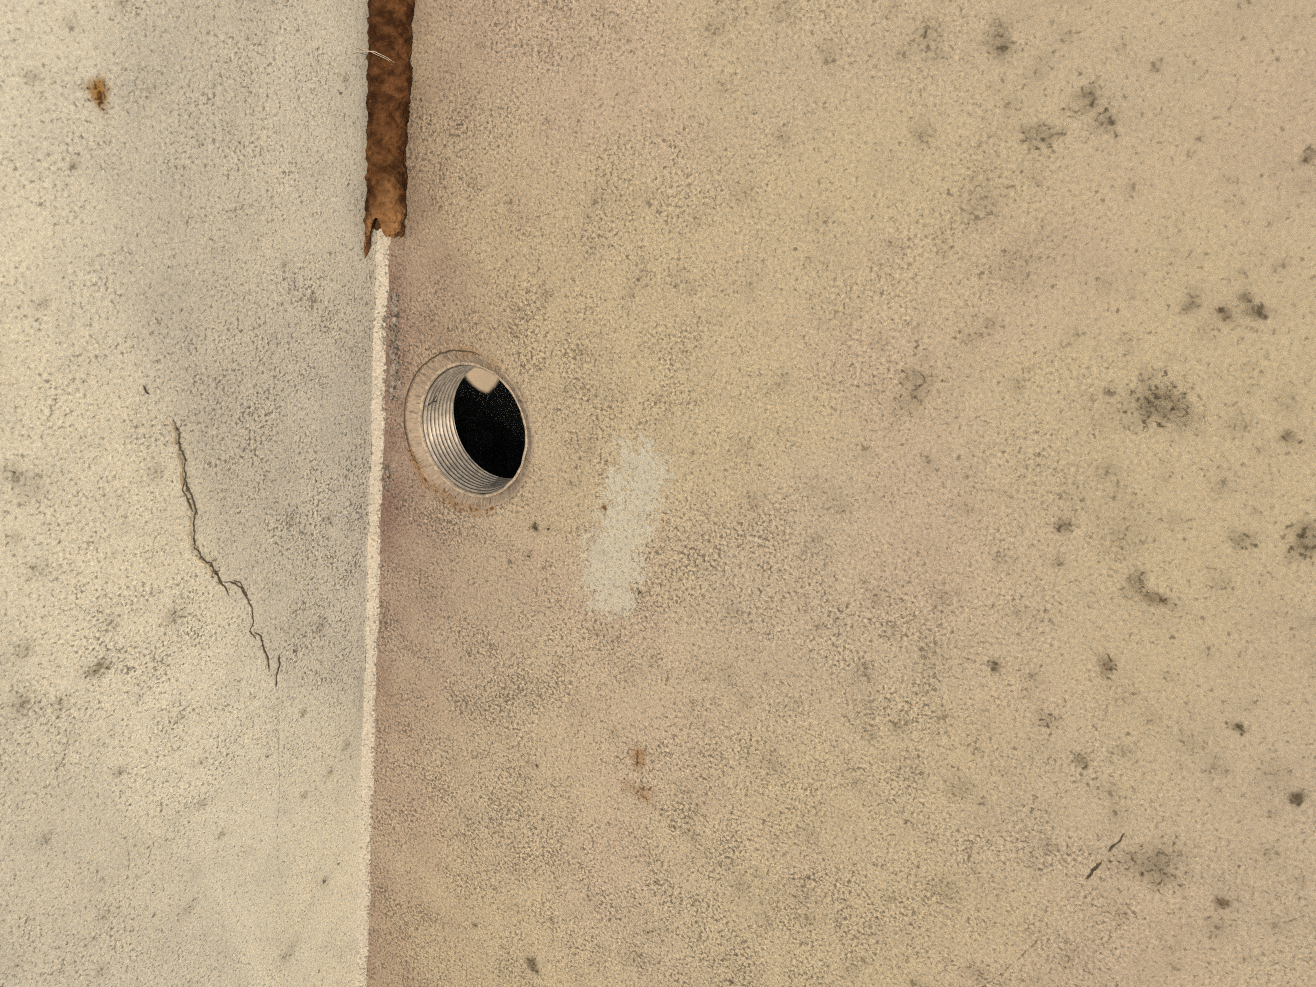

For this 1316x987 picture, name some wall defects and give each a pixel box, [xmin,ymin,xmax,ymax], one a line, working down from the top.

crack [168,420,281,687]